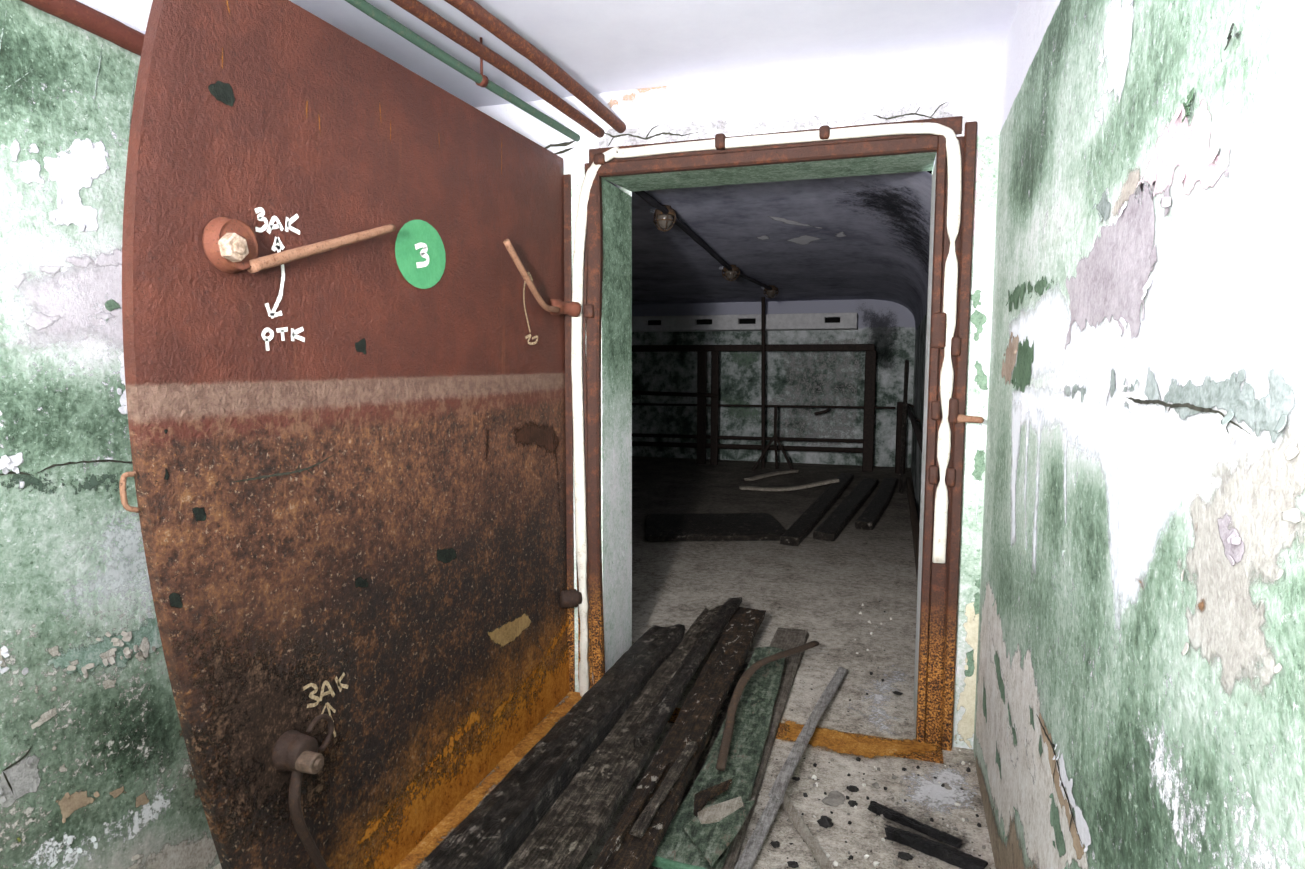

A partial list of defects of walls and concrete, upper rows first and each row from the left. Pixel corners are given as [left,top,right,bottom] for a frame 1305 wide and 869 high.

flaking render [1006,87,1230,349]
flaking render [2,120,130,473]
peeling [970,289,987,341]
peeling [0,411,25,488]
crack [0,459,132,476]
peeling [972,449,986,481]
crack [1106,387,1252,435]
peeling [1110,367,1305,693]
corrosion [783,719,938,758]
peeling [954,579,1103,869]